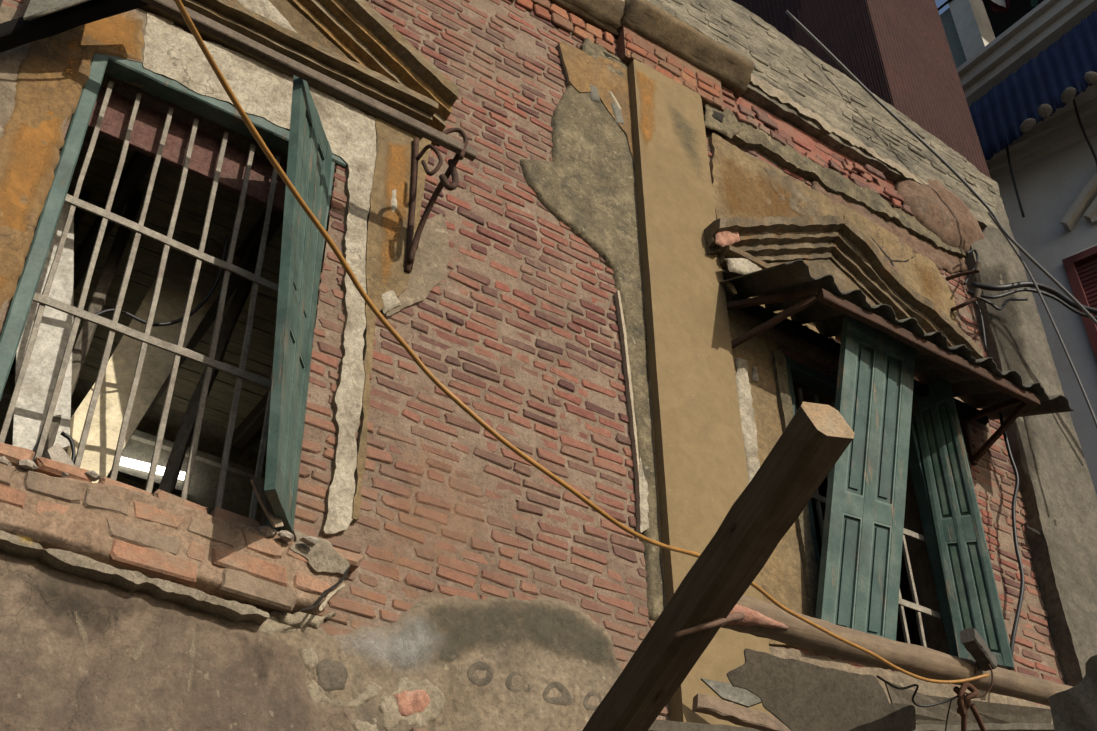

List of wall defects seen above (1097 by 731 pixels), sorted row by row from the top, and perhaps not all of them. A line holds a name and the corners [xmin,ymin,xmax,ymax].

rust [64,14,135,74]
flaking render [590,85,624,124]
rust [0,111,58,232]
flaking render [390,189,398,212]
spalling [715,231,762,275]
flaking render [382,290,401,314]
peeling [614,290,649,534]
flaking render [212,609,337,635]
water stain [367,606,612,663]